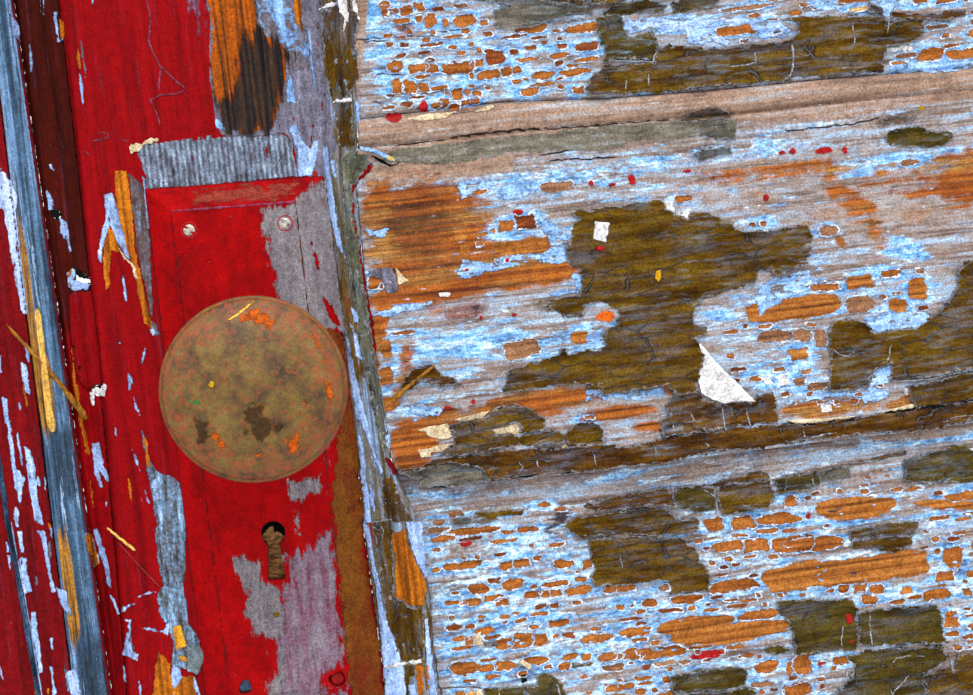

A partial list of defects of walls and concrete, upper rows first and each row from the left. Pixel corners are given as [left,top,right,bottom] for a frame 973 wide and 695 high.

peeling [377,0,973,121]
peeling [0,171,28,314]
peeling [98,0,433,474]
peeling [457,178,575,200]
peeling [69,291,107,406]
rust [239,307,276,330]
rust [194,417,226,449]
rust [244,402,300,458]
peeling [357,194,973,695]
peeling [201,468,230,694]
peeling [232,451,353,695]